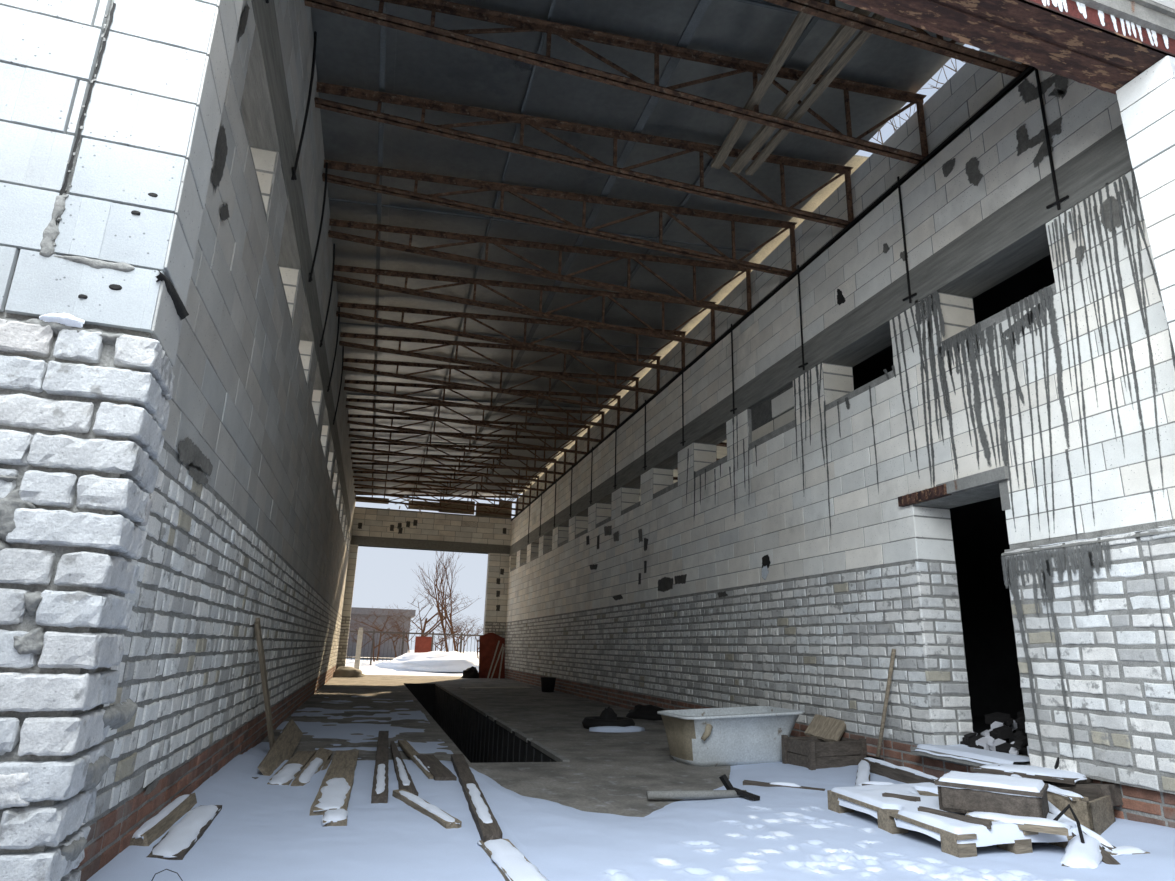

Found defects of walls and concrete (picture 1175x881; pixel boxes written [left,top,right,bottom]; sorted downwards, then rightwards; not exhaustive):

leakage [1042,0,1169,49]
crack [51,3,116,254]
leakage [794,362,850,534]
leakage [869,386,879,492]
leakage [883,168,1175,767]